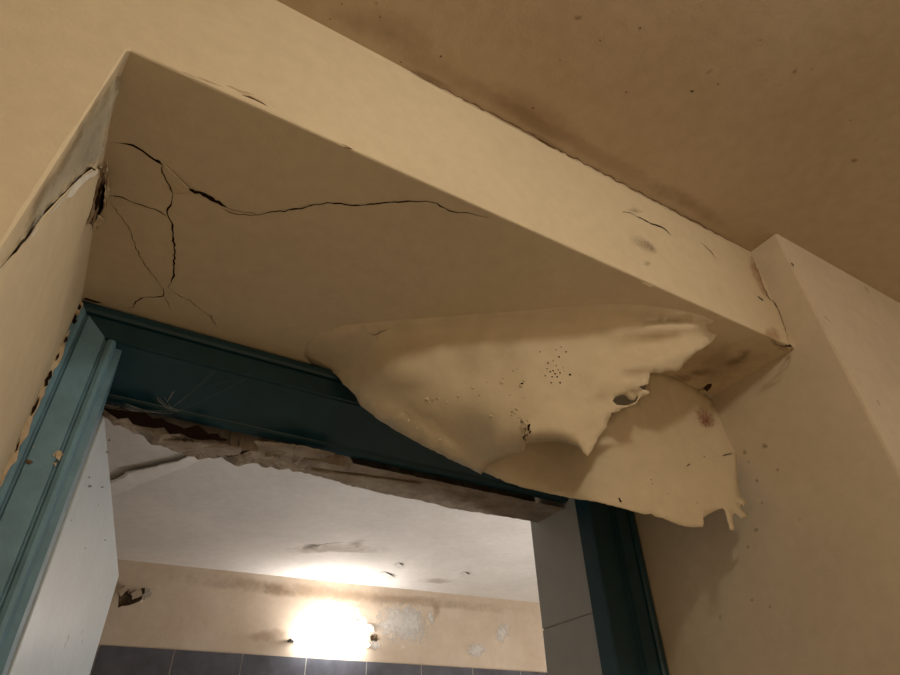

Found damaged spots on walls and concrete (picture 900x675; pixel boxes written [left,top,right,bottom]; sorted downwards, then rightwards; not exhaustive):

crack [0,167,98,268]
crack [110,142,484,323]
crack [400,65,789,340]
flaking render [0,298,102,486]
peeling [102,373,747,530]
flaking render [118,585,153,608]
peeling [348,607,433,649]